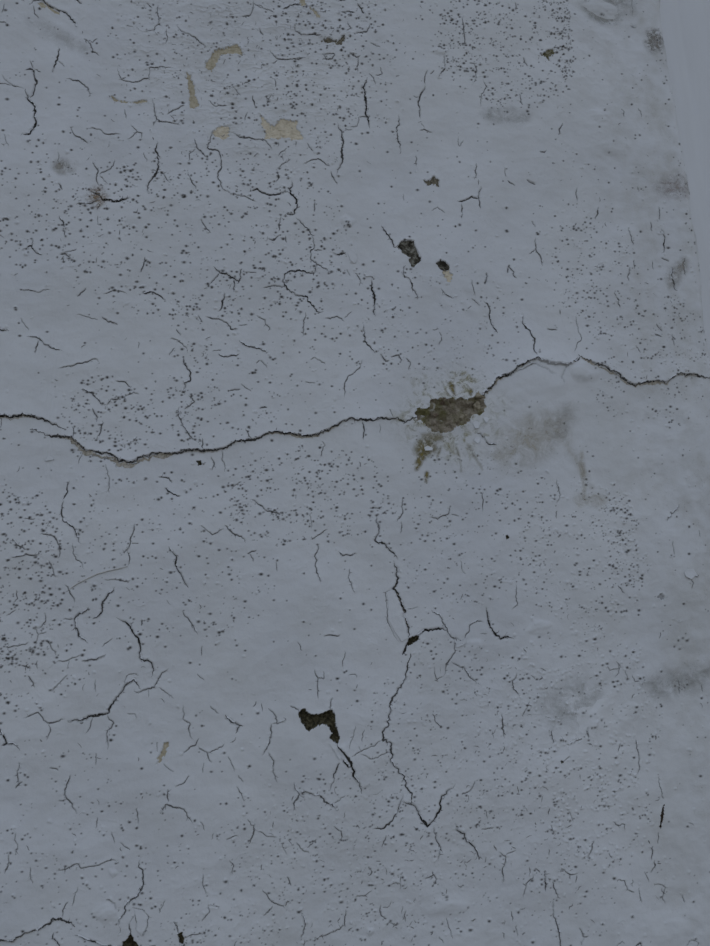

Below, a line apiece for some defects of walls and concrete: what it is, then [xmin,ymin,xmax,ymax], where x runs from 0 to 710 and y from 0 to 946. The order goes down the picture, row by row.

peeling [205,44,243,72]
peeling [260,115,303,141]
peeling [398,240,421,268]
peeling [436,259,452,282]
crack [0,0,425,789]
spalling [415,391,487,444]